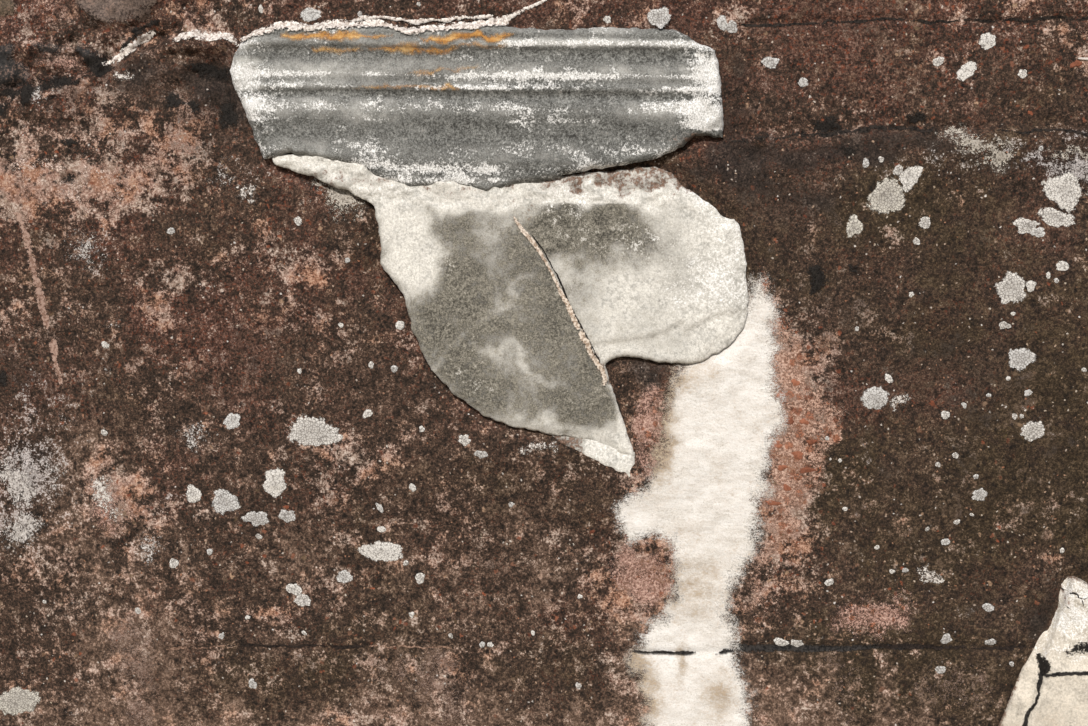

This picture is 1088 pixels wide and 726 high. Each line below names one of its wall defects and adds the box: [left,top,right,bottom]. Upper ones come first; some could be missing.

crack [0,19,160,100]
rust [283,30,509,53]
crack [513,216,608,386]
leakage [615,278,787,726]
crack [634,643,1088,726]